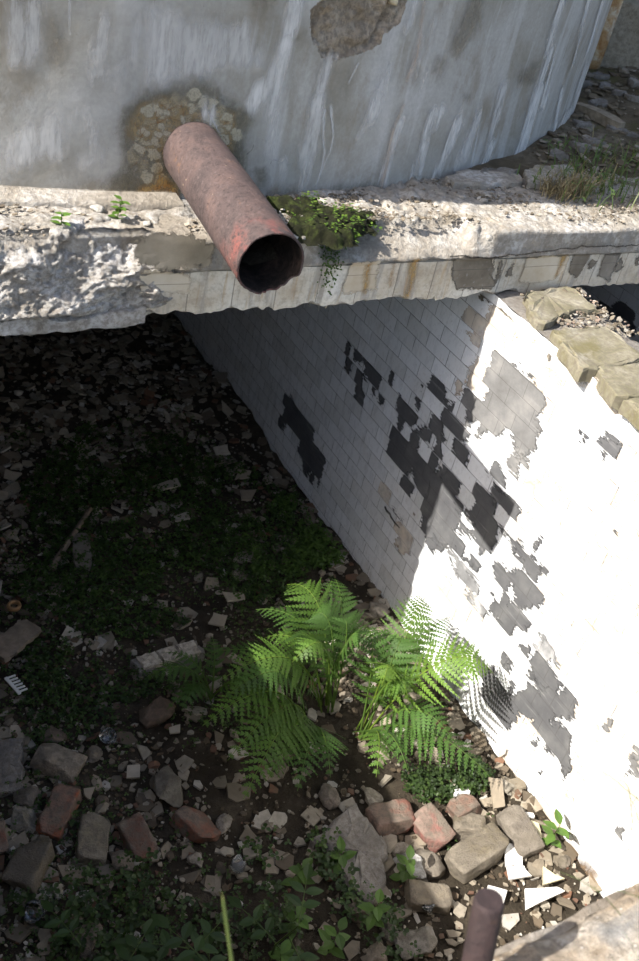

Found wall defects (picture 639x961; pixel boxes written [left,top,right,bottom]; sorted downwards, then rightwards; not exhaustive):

spalling [309,0,407,64]
spalling [0,199,215,322]
peeling [278,393,326,488]
peeling [342,254,639,805]
peeling [538,791,580,835]